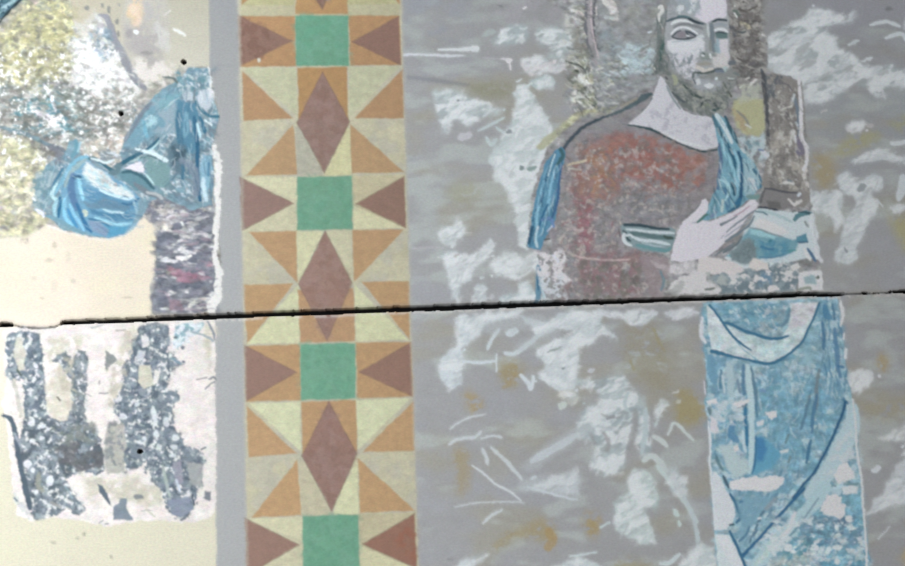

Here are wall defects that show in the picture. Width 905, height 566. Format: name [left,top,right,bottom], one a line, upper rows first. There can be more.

peeling [766,5,905,114]
peeling [432,24,576,301]
peeling [810,140,905,266]
peeling [846,121,875,133]
crack [0,287,905,333]
peeling [438,307,718,566]